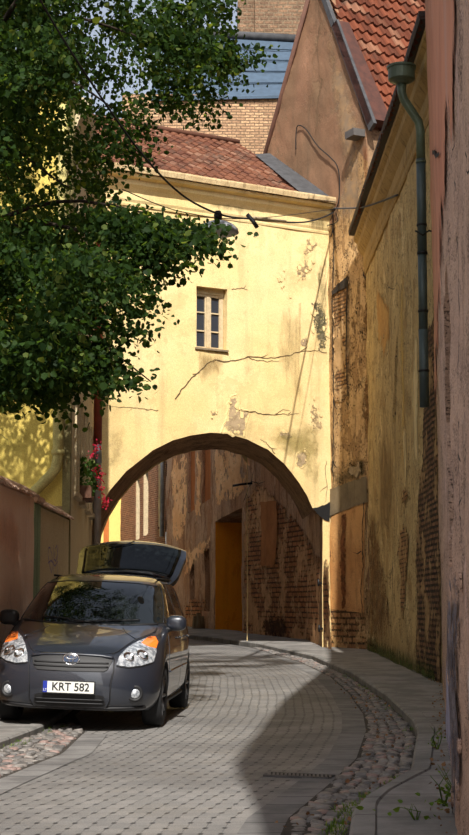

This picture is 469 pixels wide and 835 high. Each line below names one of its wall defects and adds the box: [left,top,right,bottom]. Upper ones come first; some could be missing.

peeling [211,393,250,438]
crack [175,231,337,516]
peeling [301,303,330,350]
peeling [308,397,323,431]
flaking render [214,448,391,649]
flaking render [397,307,463,811]